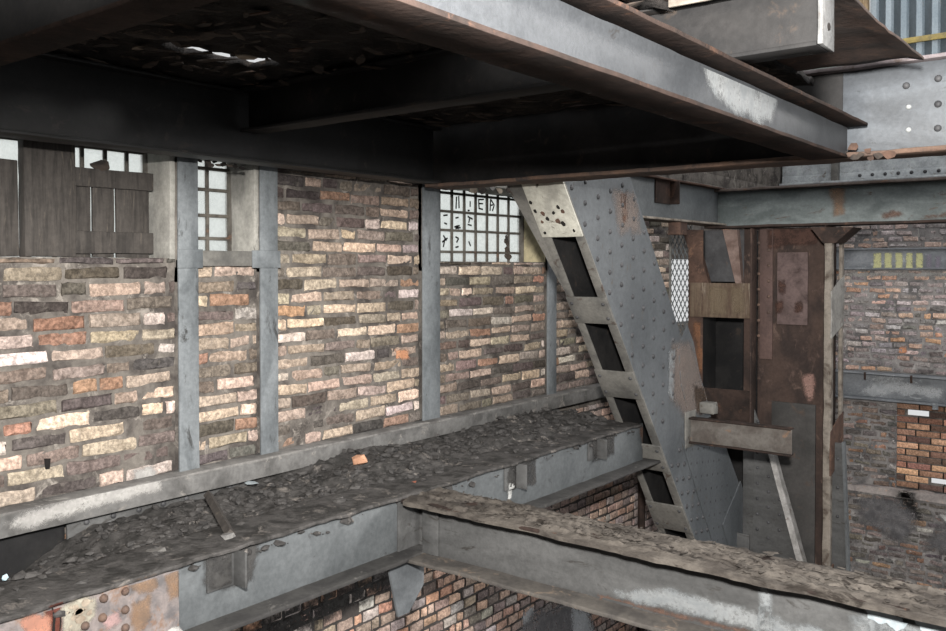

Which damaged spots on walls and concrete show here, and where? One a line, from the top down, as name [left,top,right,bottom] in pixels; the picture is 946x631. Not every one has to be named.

rust [131,572,179,631]
rust [21,614,51,631]
water stain [571,608,592,631]
peeling [861,609,946,631]